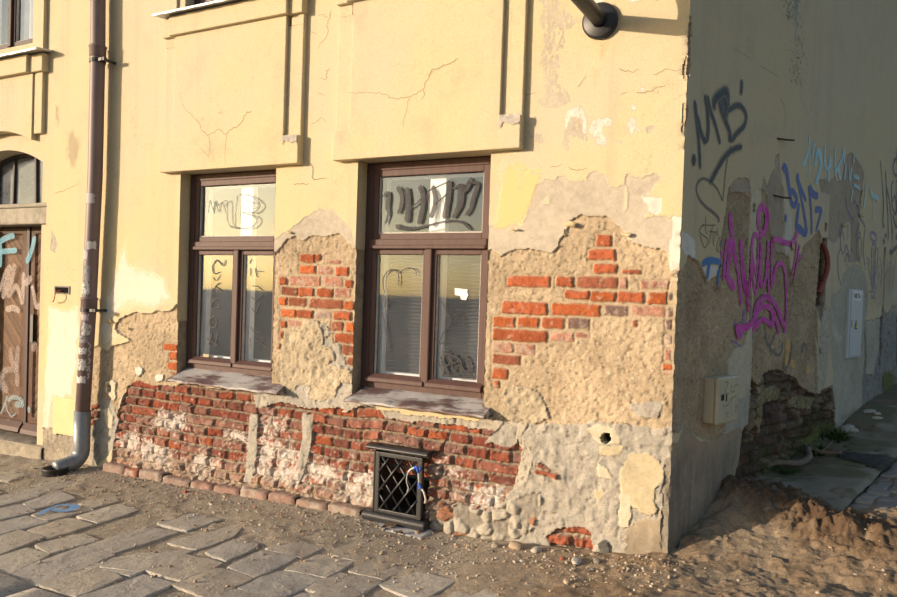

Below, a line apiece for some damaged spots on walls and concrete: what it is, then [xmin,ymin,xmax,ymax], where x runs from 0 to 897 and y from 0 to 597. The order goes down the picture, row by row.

crack [183,105,249,157]
crack [351,59,456,123]
spalling [499,113,520,127]
flaking render [84,152,864,554]